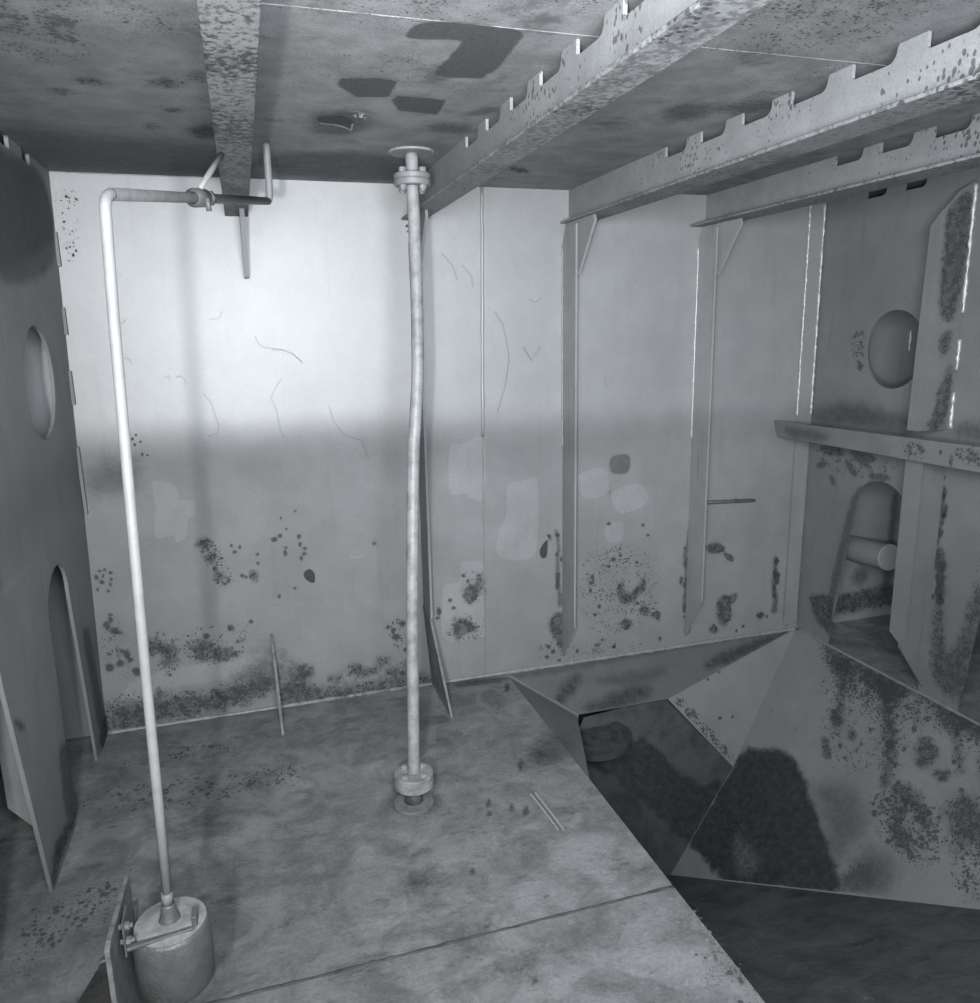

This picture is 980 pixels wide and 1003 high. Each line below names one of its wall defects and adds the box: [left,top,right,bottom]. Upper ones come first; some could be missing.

rust [0,0,96,64]
spalling [318,110,371,133]
rust [938,192,973,354]
rust [927,373,952,431]
rust [195,538,259,587]
rust [537,543,661,661]
rust [756,558,780,618]
rust [85,614,407,747]
rust [798,477,980,903]
rust [19,880,123,960]